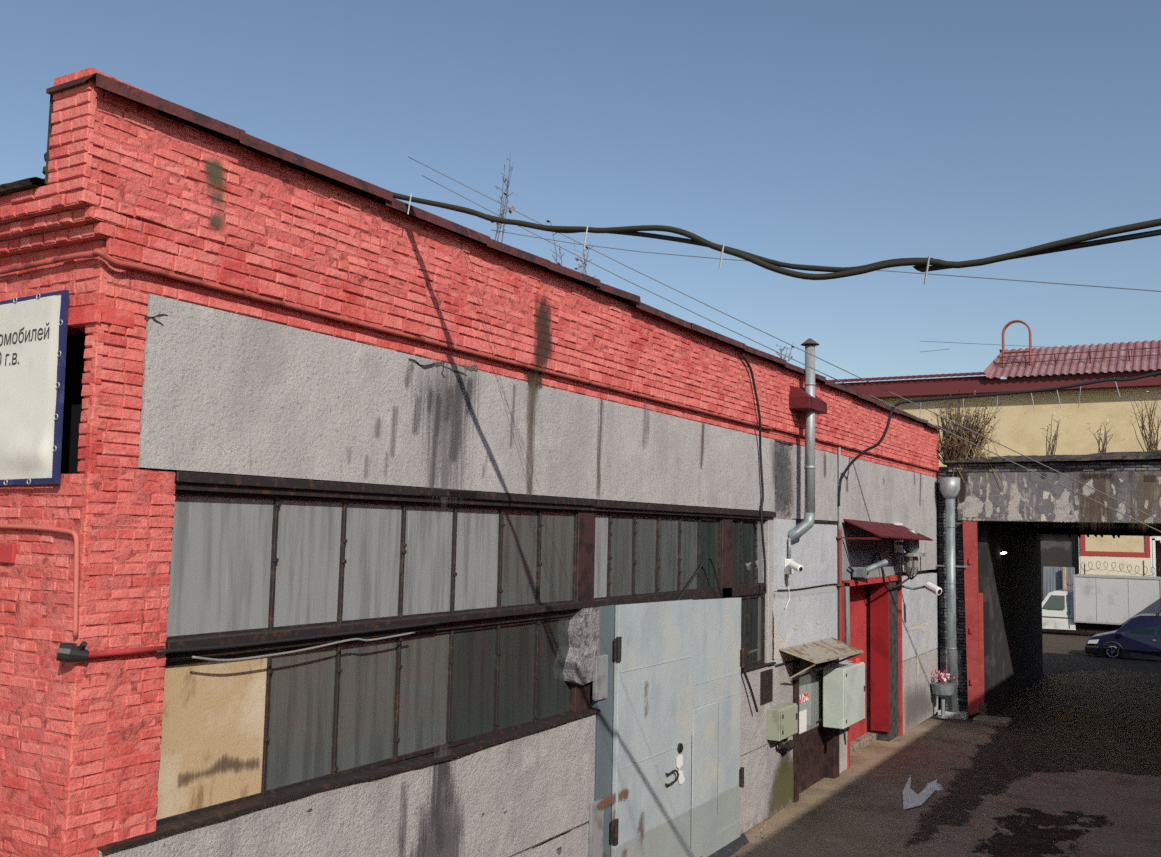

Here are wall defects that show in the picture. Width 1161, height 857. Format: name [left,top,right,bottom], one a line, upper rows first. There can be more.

water stain [429,373,476,492]
peeling [957,476,1161,523]
water stain [418,748,460,857]